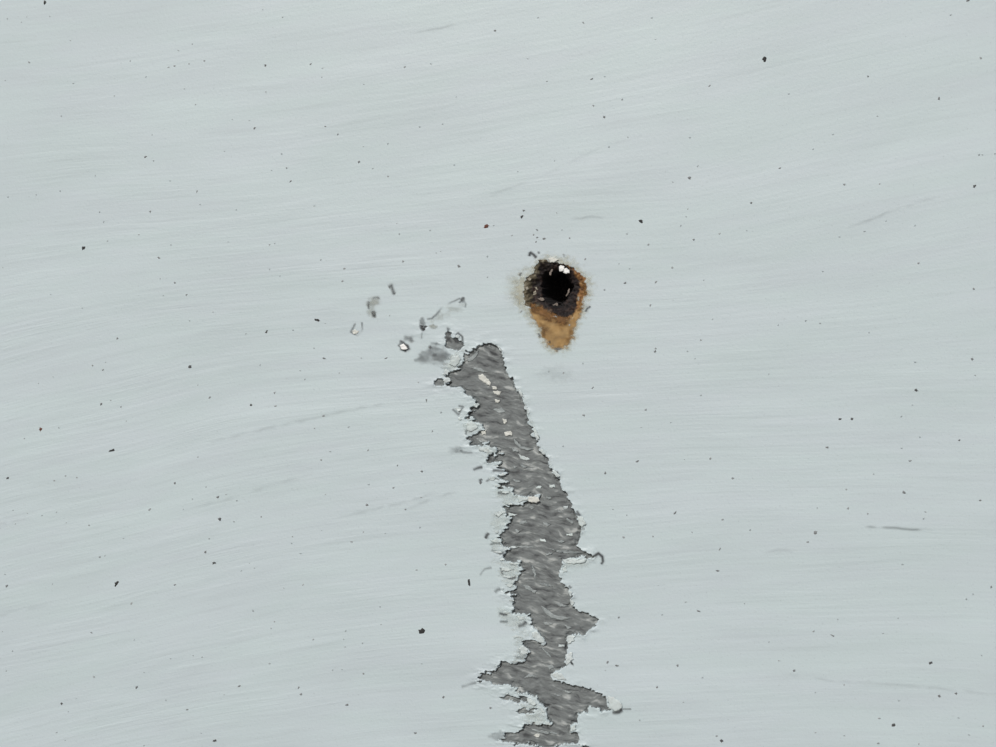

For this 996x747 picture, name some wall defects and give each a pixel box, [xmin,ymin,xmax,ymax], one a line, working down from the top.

corrosion [517,280,590,350]
peeling [434,331,622,747]